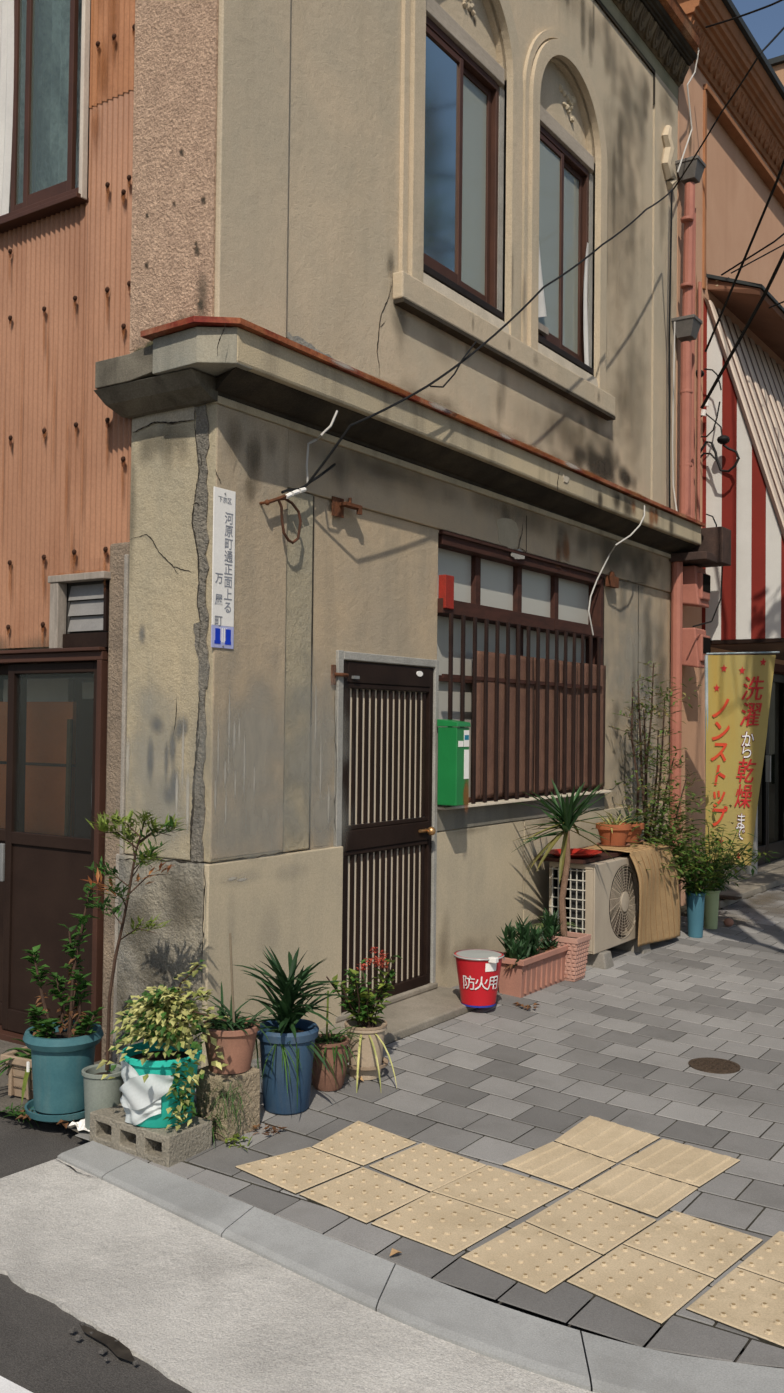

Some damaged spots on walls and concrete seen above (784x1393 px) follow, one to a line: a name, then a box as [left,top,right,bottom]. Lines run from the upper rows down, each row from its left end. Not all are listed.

crack [117,404,337,953]
leakage [576,445,631,513]